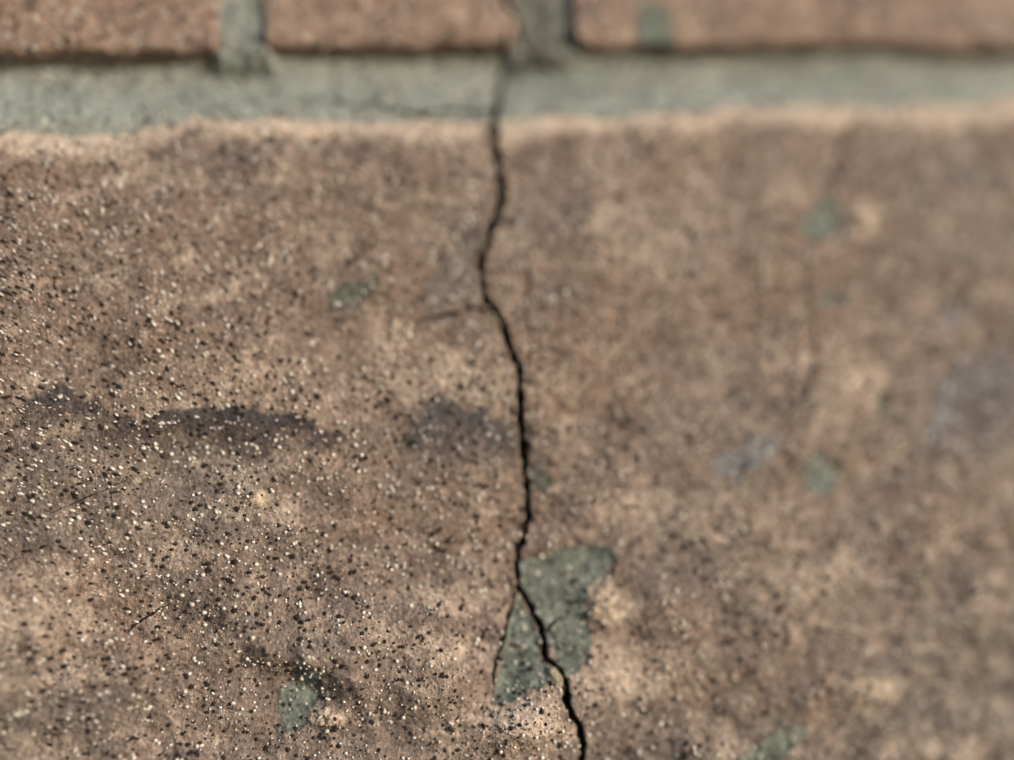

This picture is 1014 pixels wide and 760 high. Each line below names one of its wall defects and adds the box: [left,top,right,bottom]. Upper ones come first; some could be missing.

crack [327,0,653,760]
spalling [493,544,616,705]